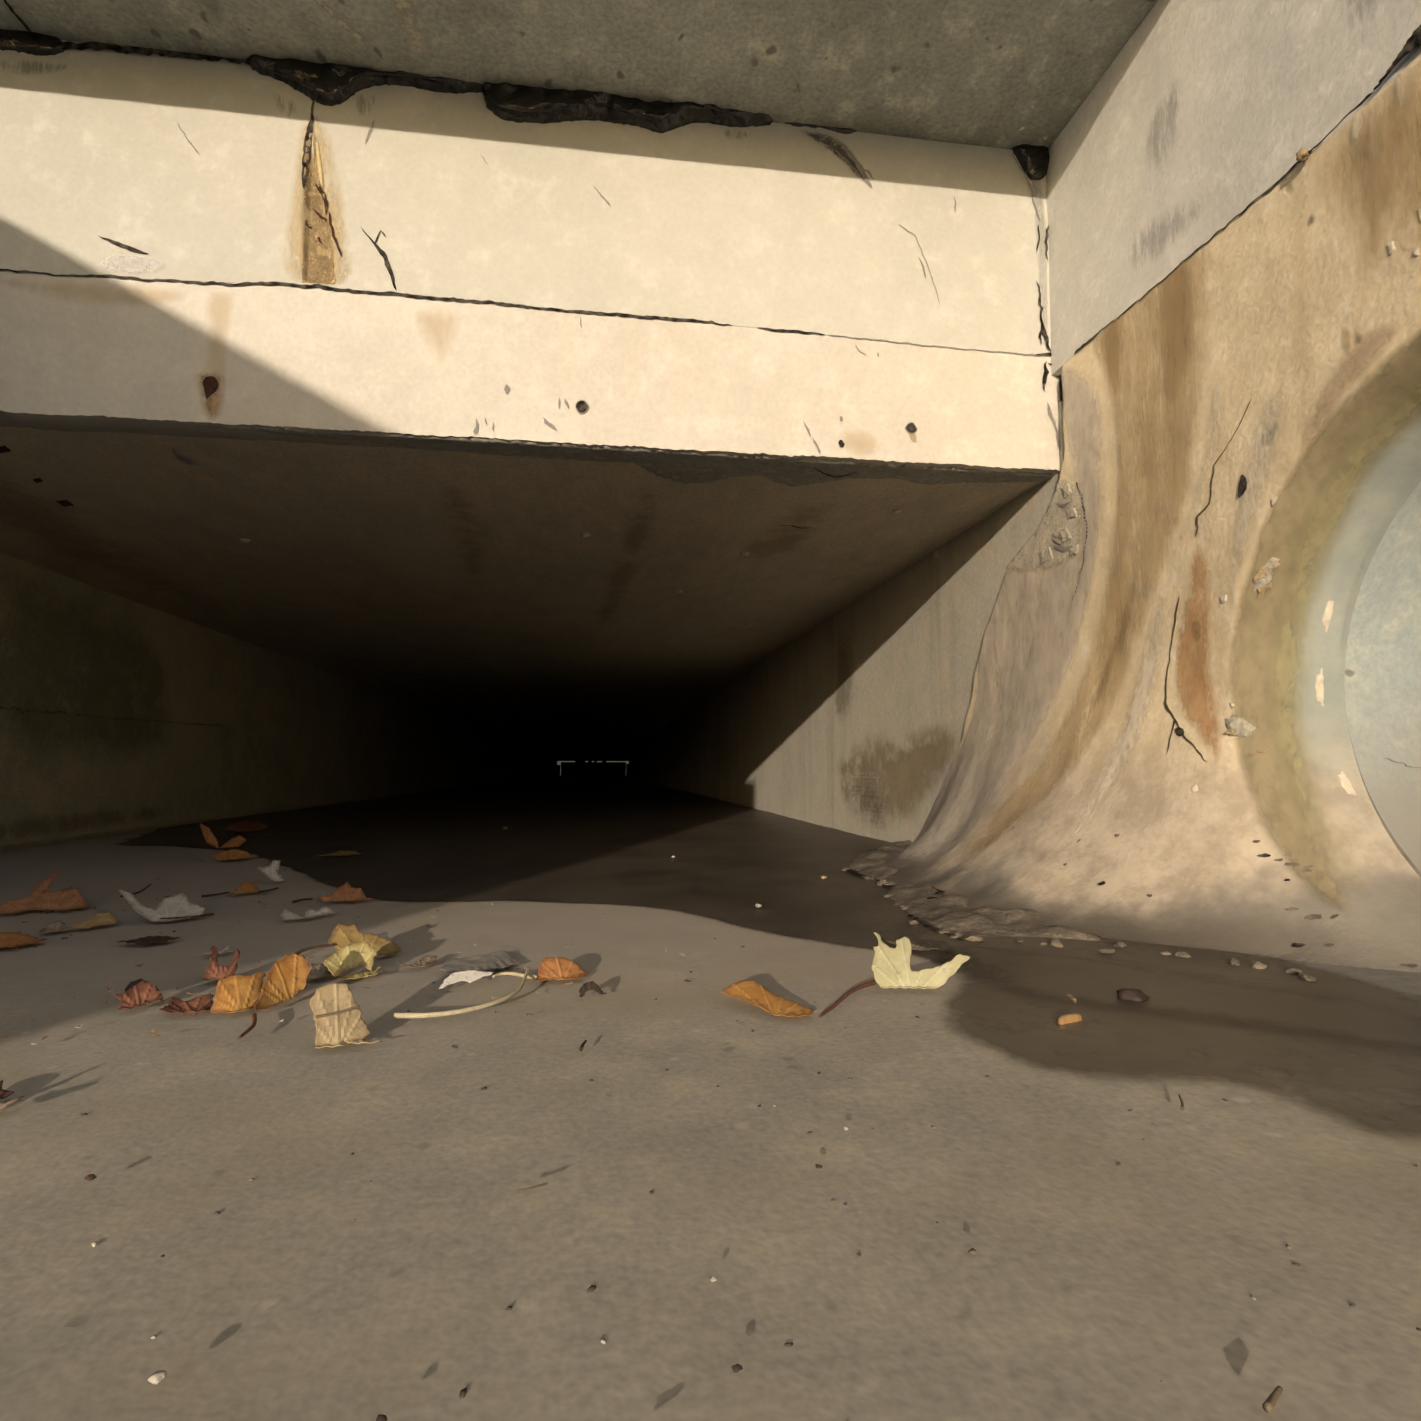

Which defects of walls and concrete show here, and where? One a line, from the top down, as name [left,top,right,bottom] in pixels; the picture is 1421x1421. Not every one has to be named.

crack [3,0,249,65]
spalling [301,127,342,284]
crack [0,24,1421,451]
crack [1067,482,1088,617]
rust [978,258,1199,849]
crack [1195,399,1251,537]
damp [1236,401,1277,550]
damp [1076,611,1161,832]
crack [1164,595,1207,762]
rust [1179,555,1216,749]
damp [118,785,1421,1136]